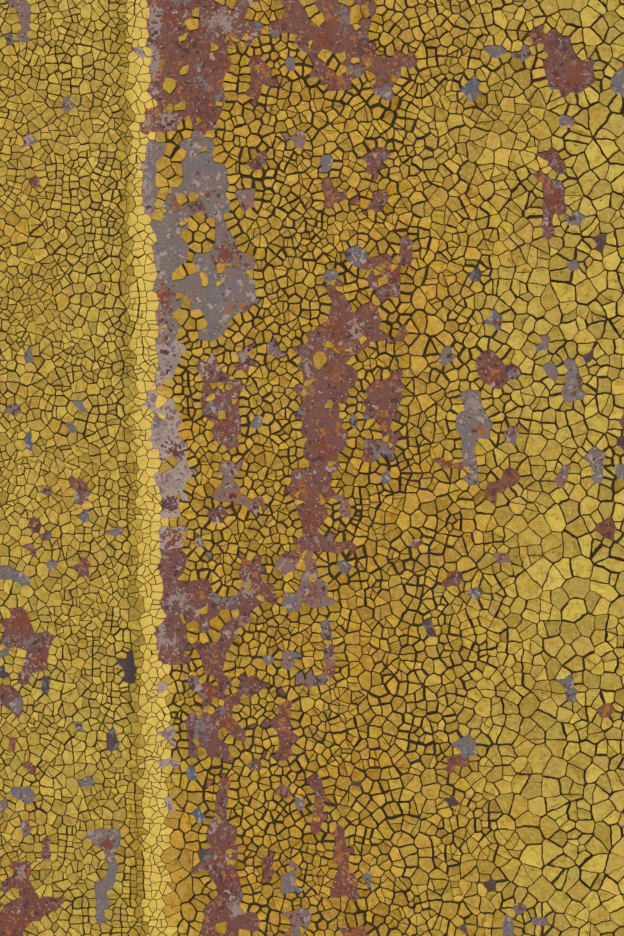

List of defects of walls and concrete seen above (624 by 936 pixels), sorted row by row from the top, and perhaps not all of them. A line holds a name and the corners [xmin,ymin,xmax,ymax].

crack [248,0,285,26]
corrosion [139,0,418,157]
corrosion [519,25,594,97]
crack [182,216,215,276]
corrosion [145,152,258,336]
crack [0,0,204,936]
peeling [135,0,444,936]
crack [339,363,378,423]
peeling [433,389,521,506]
peeling [505,496,624,657]
peeling [0,607,54,718]
corrosion [199,776,260,936]